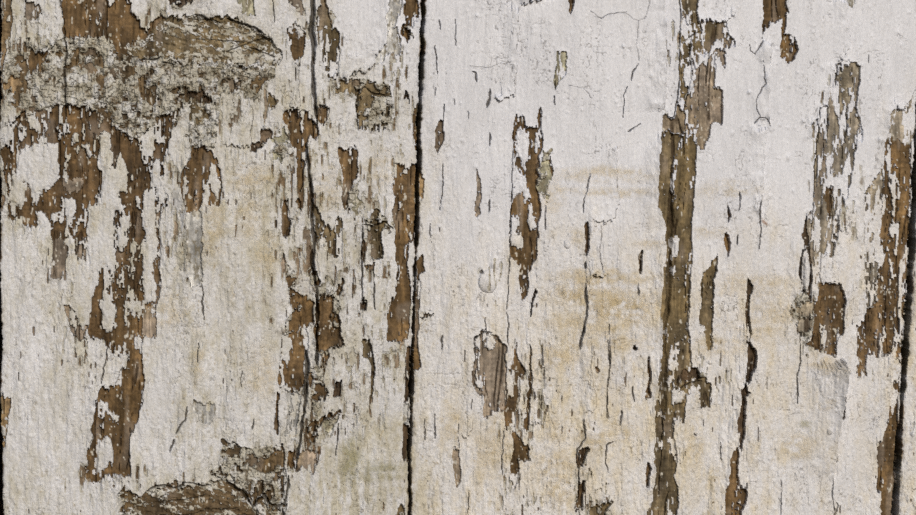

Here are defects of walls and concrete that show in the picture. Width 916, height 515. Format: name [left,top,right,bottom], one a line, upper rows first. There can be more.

peeling [316,0,418,150]
crack [749,41,771,126]
peeling [762,0,797,63]
peeling [1,0,344,515]
peeling [313,148,430,461]
peeling [509,113,553,306]
crack [578,173,604,350]
peeling [638,0,736,515]
peeling [790,61,915,515]
peeling [452,449,460,486]
peeling [472,331,531,485]
crack [574,324,635,515]